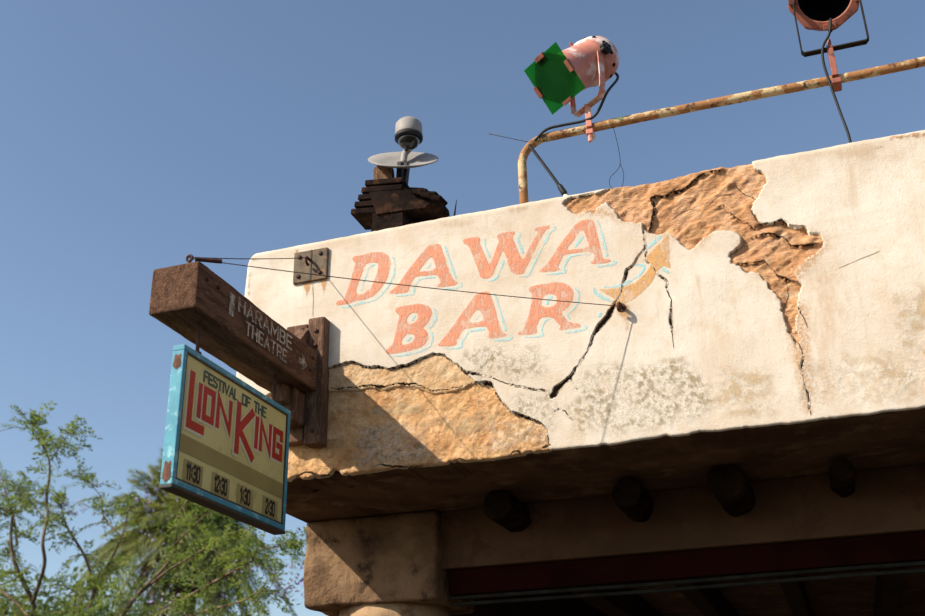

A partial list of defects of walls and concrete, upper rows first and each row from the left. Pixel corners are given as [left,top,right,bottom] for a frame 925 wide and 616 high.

spalling [287,353,551,481]
crack [329,231,674,455]
spalling [564,164,824,345]
crack [793,307,811,414]